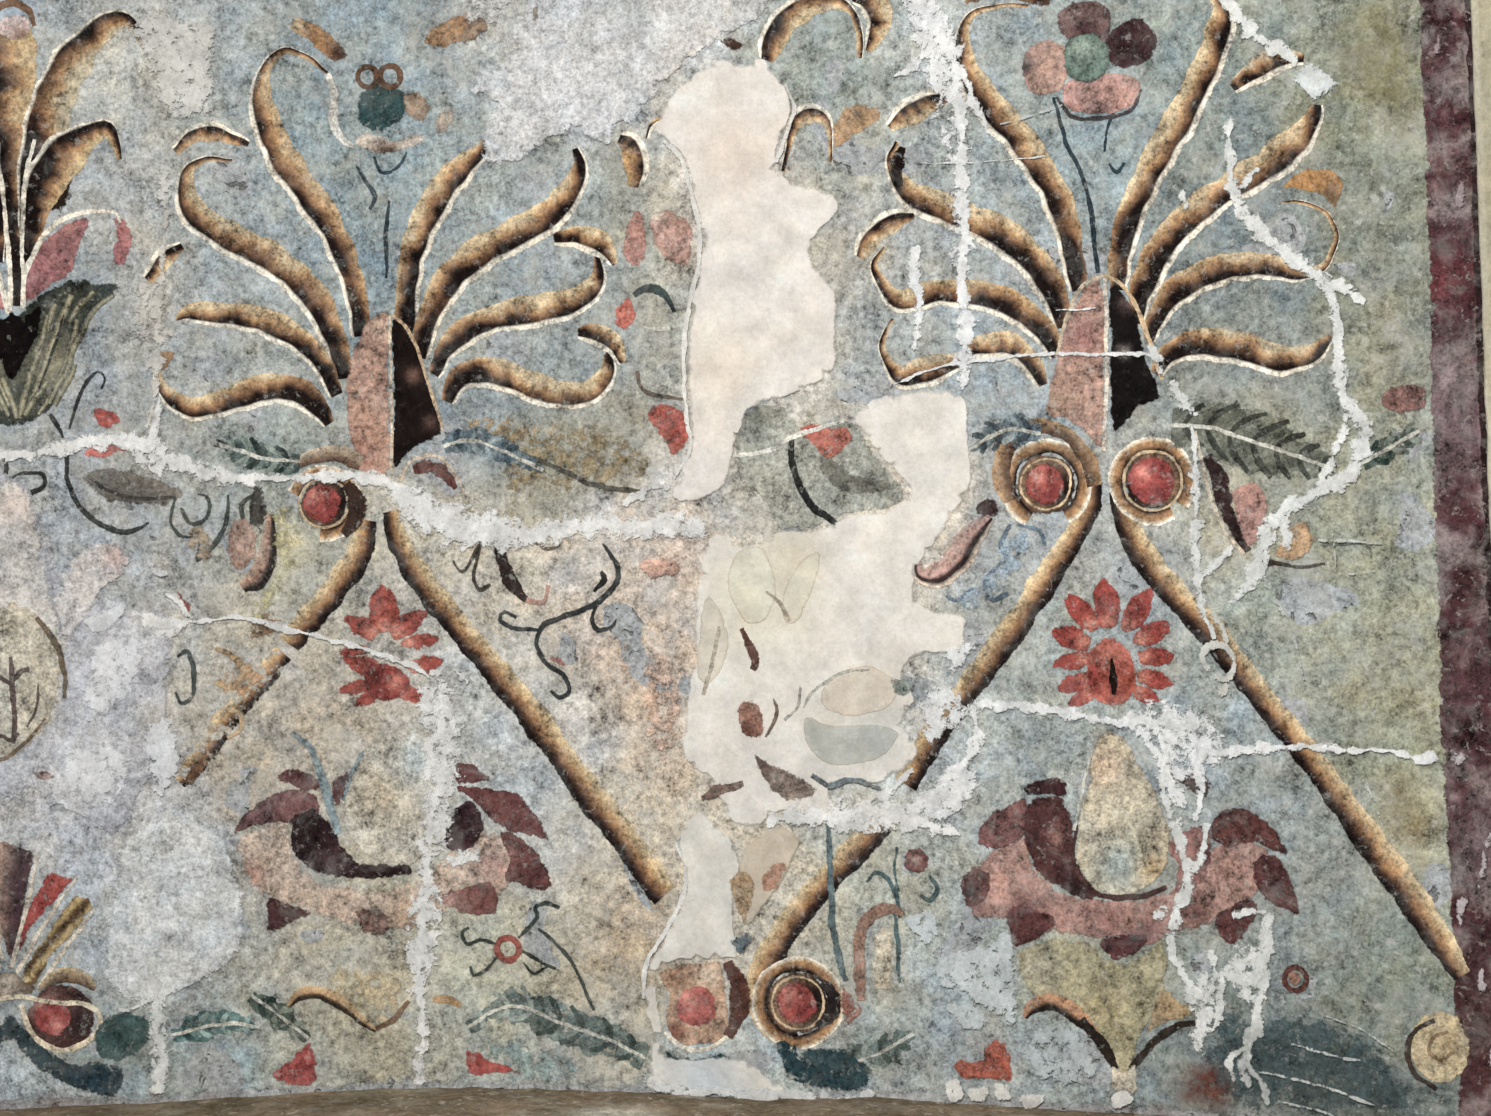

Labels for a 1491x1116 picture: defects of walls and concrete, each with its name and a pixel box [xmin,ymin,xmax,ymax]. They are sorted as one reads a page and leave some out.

crack [129,593,481,1086]
crack [0,210,709,554]
flaking render [460,0,838,501]
flaking render [621,391,976,1101]
crack [766,0,1438,1105]